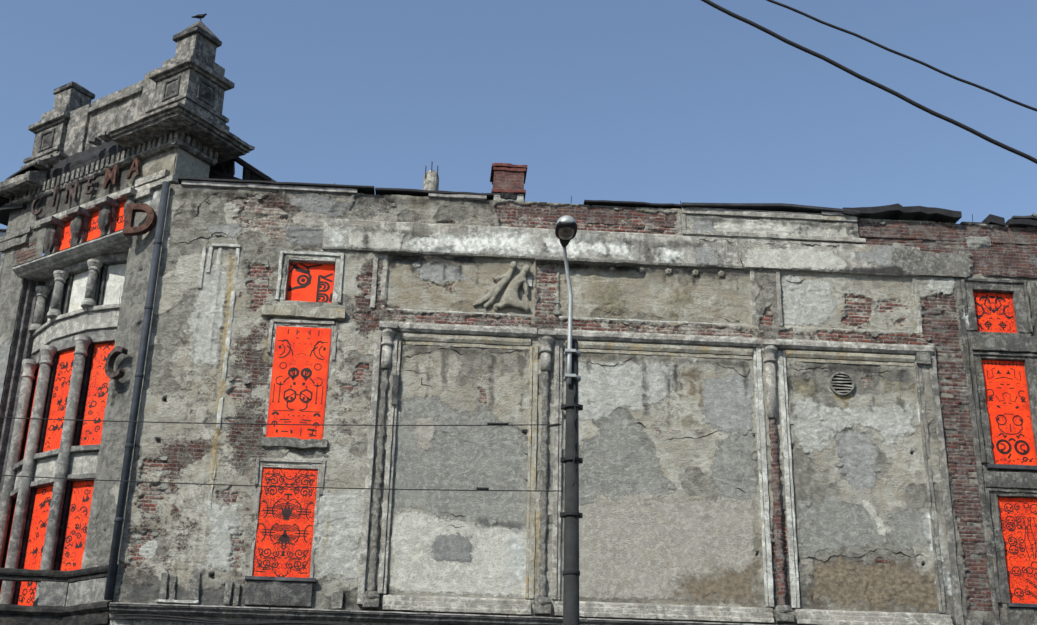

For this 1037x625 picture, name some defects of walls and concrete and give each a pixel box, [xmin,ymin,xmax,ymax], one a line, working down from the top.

flaking render [207,194,288,245]
flaking render [496,202,679,235]
spalling [854,223,1037,278]
flaking render [247,260,273,312]
flaking render [228,378,252,400]
flaking render [136,456,169,514]
peeling [391,387,534,529]
peeling [579,405,677,500]
peeling [709,430,759,504]
flaking render [817,293,1002,614]
flaking render [124,530,158,573]
flaking render [230,529,244,568]